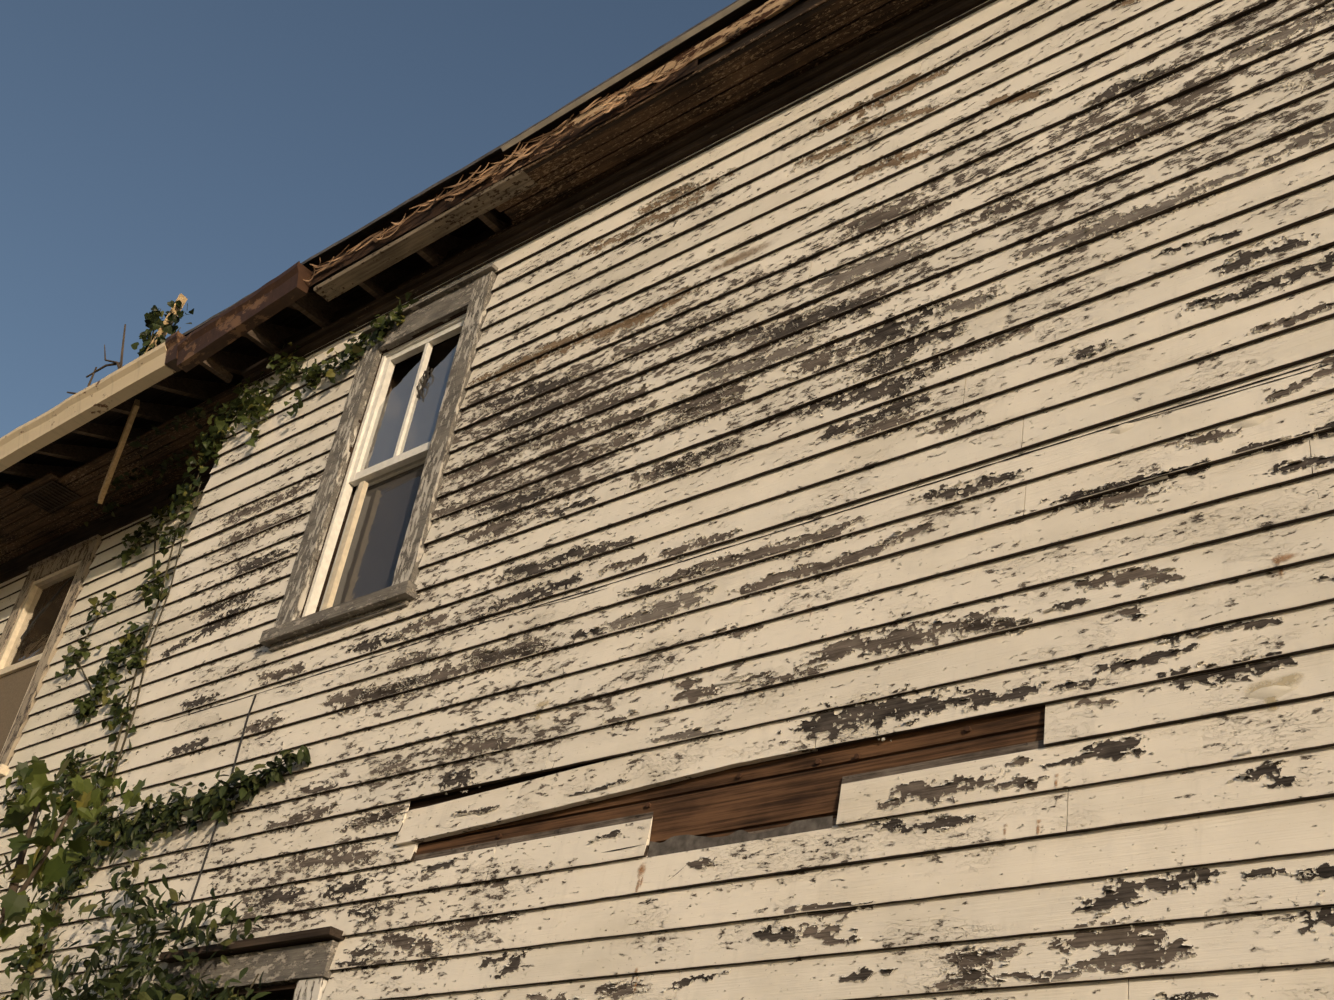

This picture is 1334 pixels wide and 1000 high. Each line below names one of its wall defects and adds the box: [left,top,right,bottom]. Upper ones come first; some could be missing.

peeling [1012,122,1334,266]
peeling [442,182,1037,483]
peeling [1151,228,1334,318]
peeling [907,467,1033,506]
peeling [1040,421,1334,515]
peeling [158,478,318,659]
peeling [317,516,936,722]
peeling [650,563,1298,749]
peeling [866,735,1154,835]
peeling [525,969,731,1000]
peeling [752,901,876,947]
peeling [926,862,1334,1000]